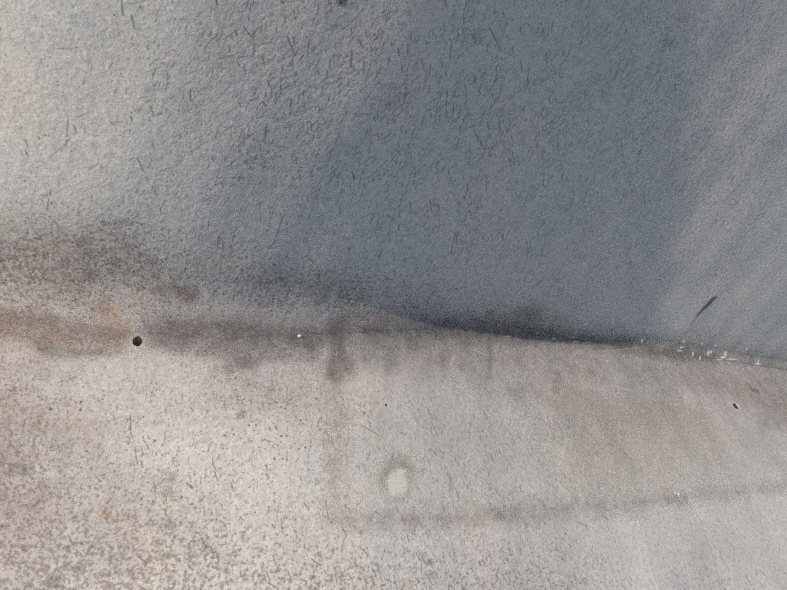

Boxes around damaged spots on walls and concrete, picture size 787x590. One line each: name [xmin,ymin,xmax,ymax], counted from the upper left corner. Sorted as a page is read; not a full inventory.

damp [0,313,129,356]
damp [142,315,787,428]
damp [384,465,407,496]